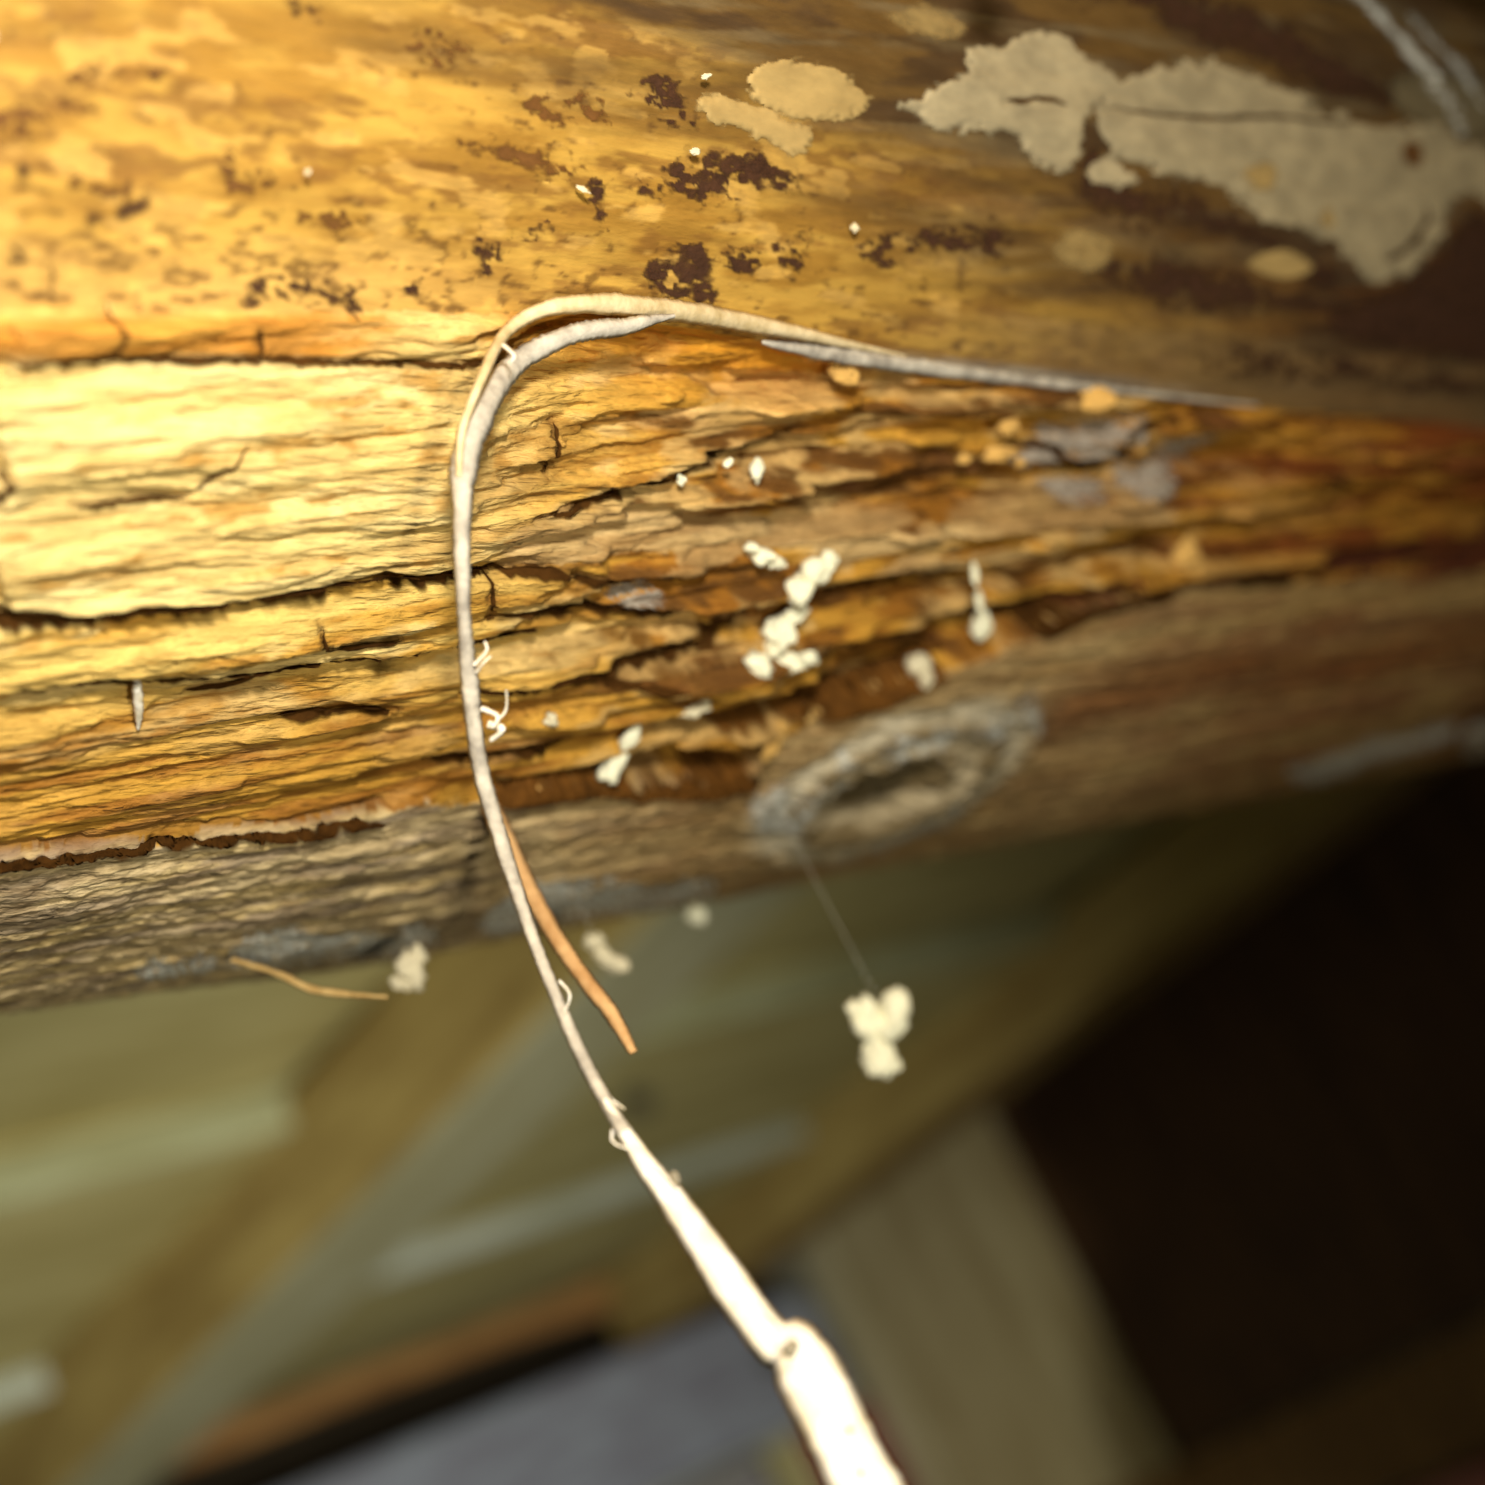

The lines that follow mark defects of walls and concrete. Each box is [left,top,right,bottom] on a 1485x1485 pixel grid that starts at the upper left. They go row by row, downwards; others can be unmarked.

crack [0,303,500,370]
crack [0,469,16,503]
crack [76,443,249,509]
crack [538,423,791,519]
crack [1085,535,1171,551]
crack [0,563,1184,814]
crack [0,815,392,874]